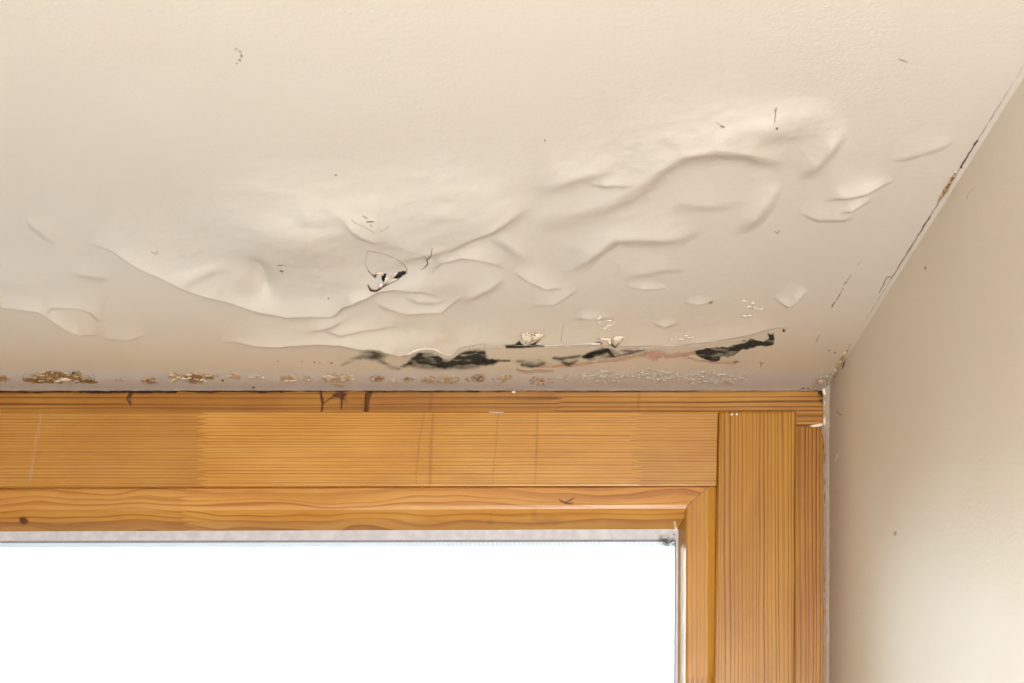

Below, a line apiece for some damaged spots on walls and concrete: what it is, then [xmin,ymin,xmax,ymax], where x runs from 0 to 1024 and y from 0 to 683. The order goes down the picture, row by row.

peeling [220,300,789,387]